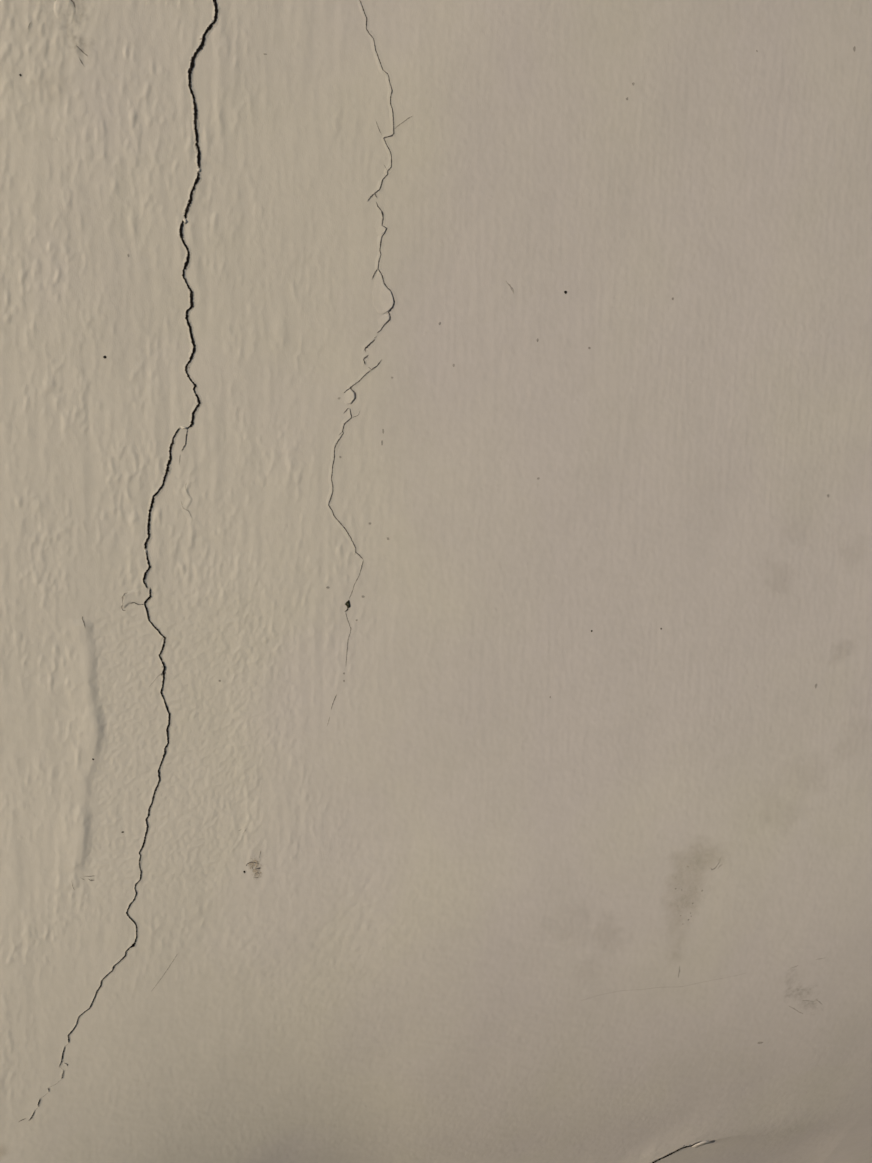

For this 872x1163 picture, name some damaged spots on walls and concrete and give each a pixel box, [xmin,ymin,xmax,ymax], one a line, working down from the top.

crack [19,0,221,1122]
crack [326,0,412,661]